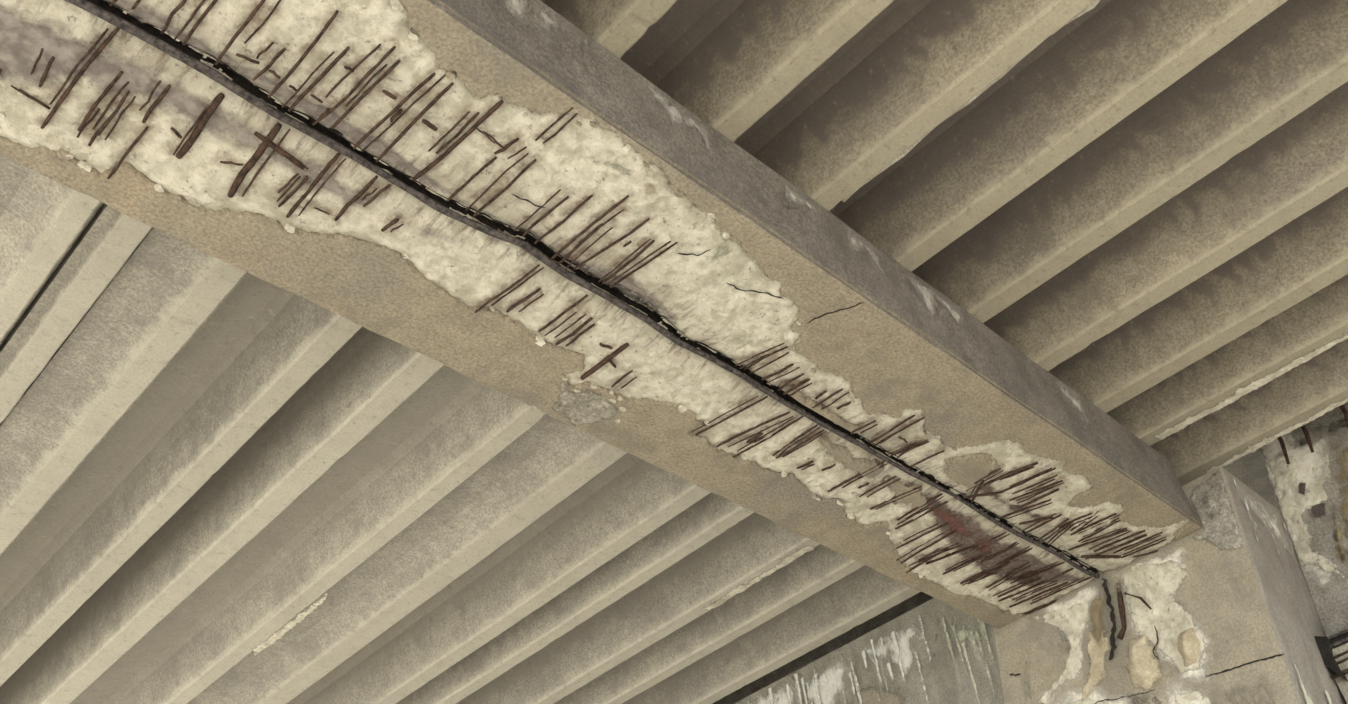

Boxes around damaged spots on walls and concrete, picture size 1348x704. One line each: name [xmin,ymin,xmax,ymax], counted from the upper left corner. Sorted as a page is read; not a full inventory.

corrosion [0,0,440,203]
spalling [0,0,1189,615]
crack [87,0,1117,660]
corrosion [568,258,675,319]
corrosion [906,481,1078,586]
spalling [1190,397,1348,550]
leakage [1234,420,1348,584]
peeling [1269,453,1348,584]
peeling [1034,603,1111,704]
corrosion [1089,598,1104,643]
crack [1095,625,1160,704]
peeling [1120,560,1207,673]